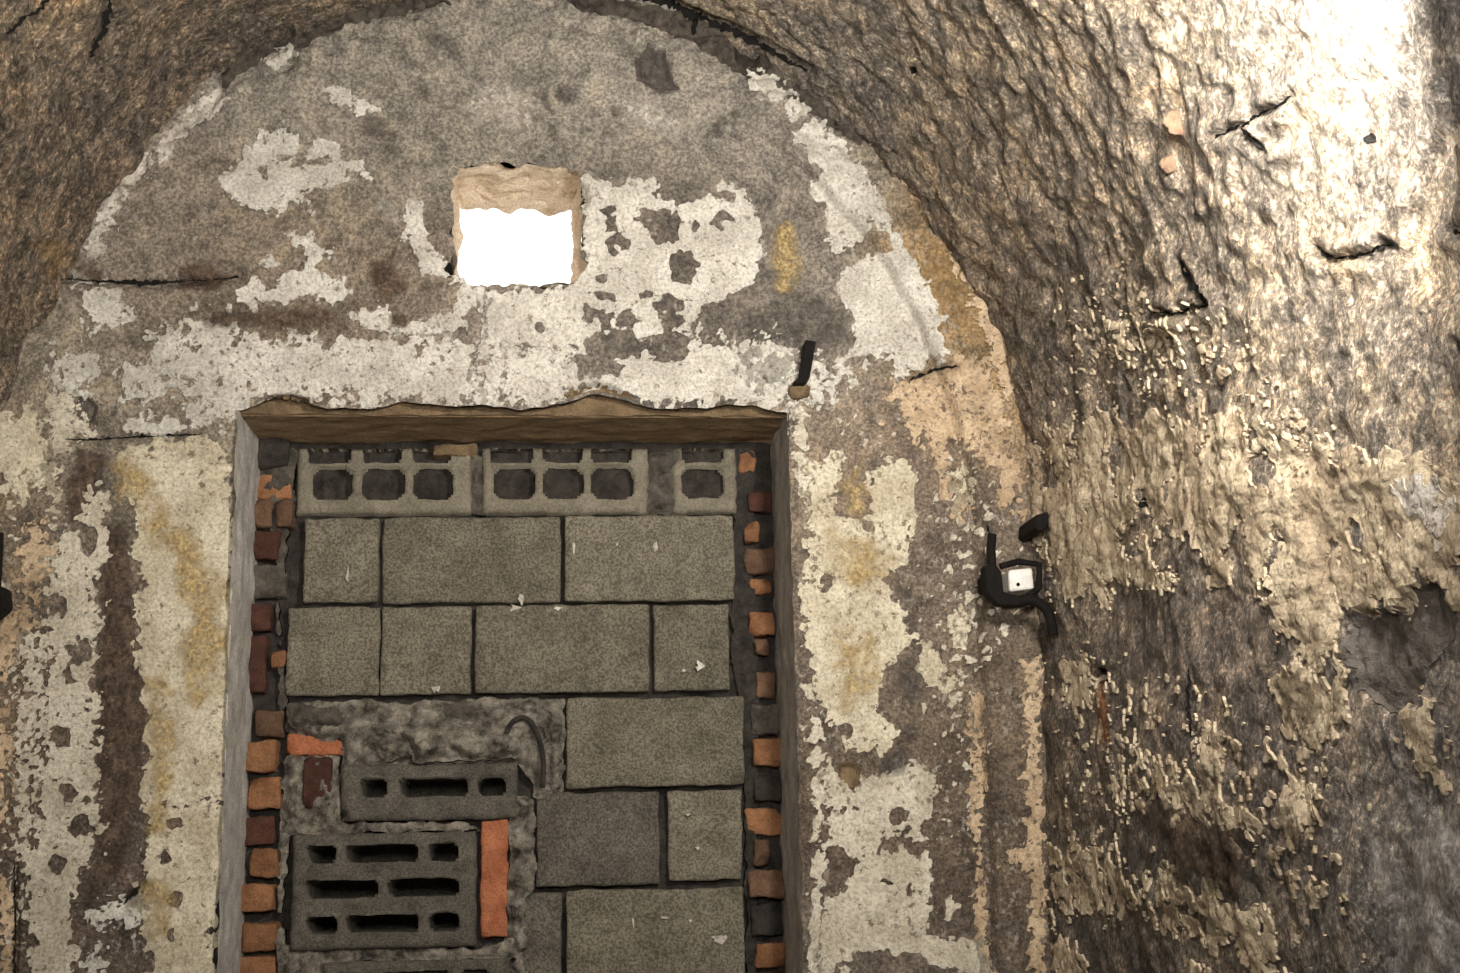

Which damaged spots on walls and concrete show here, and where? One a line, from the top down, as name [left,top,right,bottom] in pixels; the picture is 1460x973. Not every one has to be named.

crack [637,0,807,72]
spalling [69,0,452,343]
crack [1215,96,1291,149]
crack [61,275,239,287]
crack [1153,261,1207,315]
crack [1318,244,1391,259]
peeling [0,340,113,973]
peeling [803,715,998,973]
peeling [997,640,1293,973]
damp [1153,800,1245,896]
flaking render [1105,683,1331,911]
damp [1398,825,1460,973]